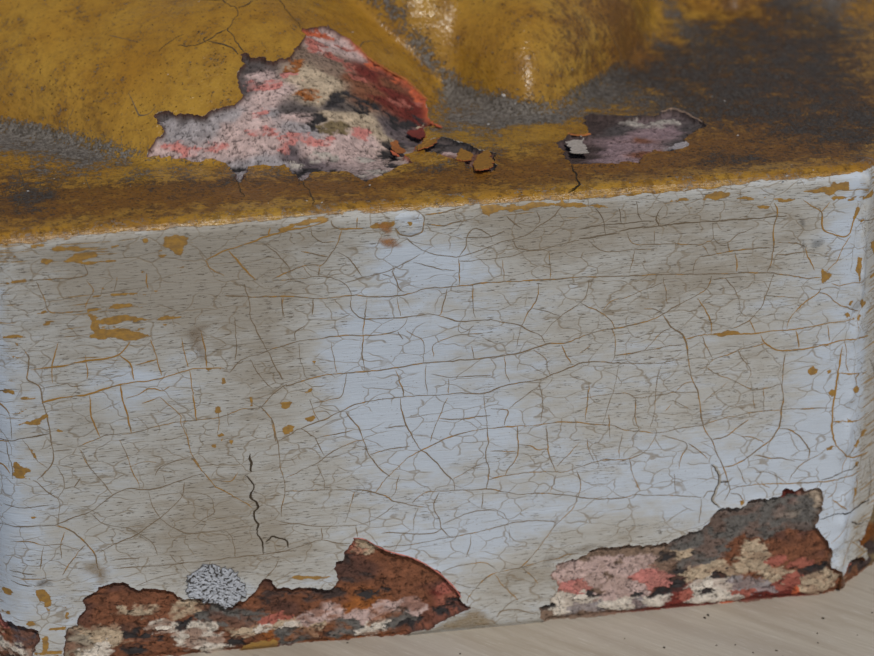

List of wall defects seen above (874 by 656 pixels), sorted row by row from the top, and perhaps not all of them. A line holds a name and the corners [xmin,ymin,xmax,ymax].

crack [159,0,252,54]
peeling [147,25,498,185]
peeling [556,108,706,164]
crack [0,164,874,616]
peeling [0,613,41,656]
peeling [63,538,471,656]
peeling [539,488,874,622]